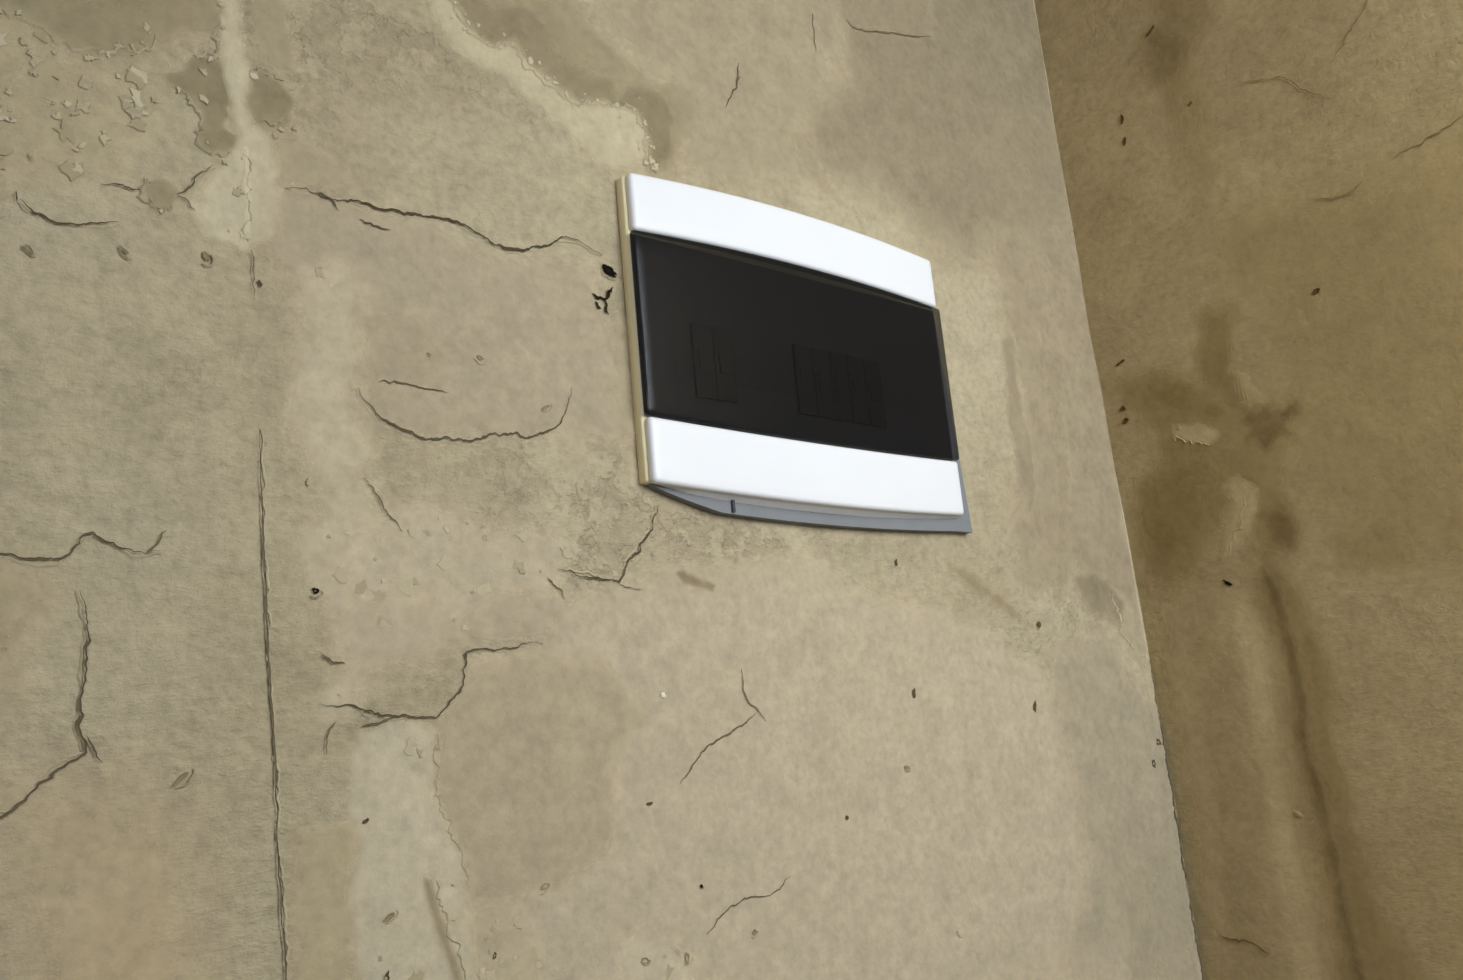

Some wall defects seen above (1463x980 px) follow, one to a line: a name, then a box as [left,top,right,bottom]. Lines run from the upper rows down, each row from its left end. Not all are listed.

crack [1393,117,1460,159]
crack [285,187,613,314]
crack [355,380,572,445]
damp [450,0,1463,980]
crack [548,505,658,598]
crack [0,531,166,819]
crack [319,642,543,755]